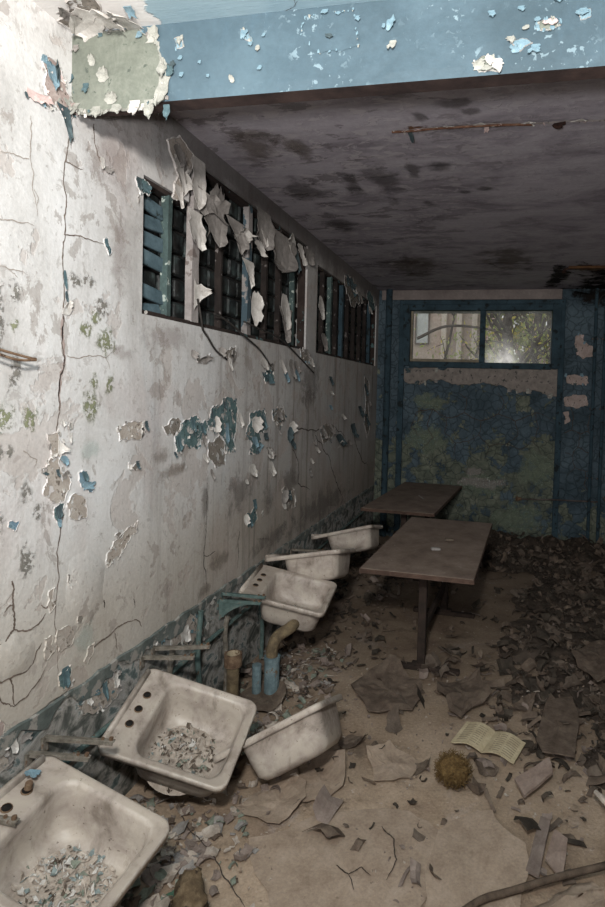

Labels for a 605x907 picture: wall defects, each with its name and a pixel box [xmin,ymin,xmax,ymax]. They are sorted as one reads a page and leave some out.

peeling [24,0,184,143]
peeling [472,54,504,73]
peeling [505,15,562,53]
crack [0,116,39,226]
crack [56,124,119,432]
peeling [166,135,315,326]
leakage [545,265,571,287]
peeling [41,419,96,528]
peeling [162,397,298,484]
peeling [403,362,589,424]
crack [0,527,61,707]
crack [94,600,142,648]